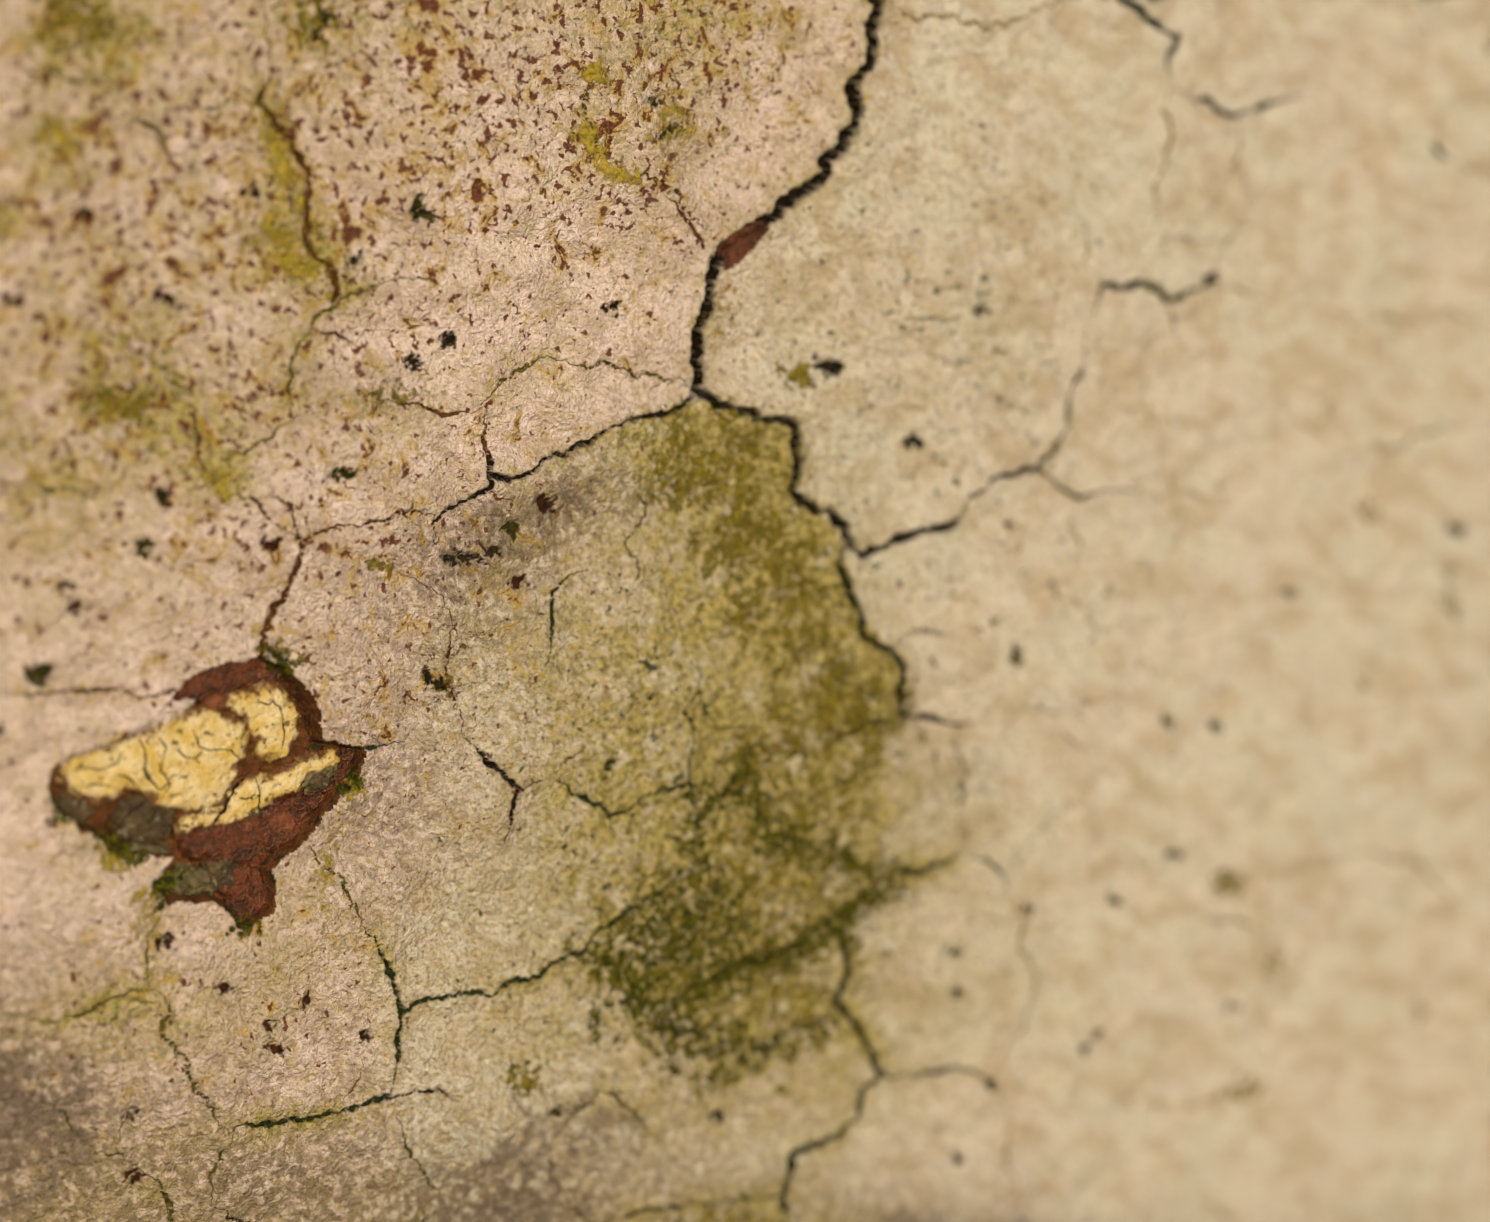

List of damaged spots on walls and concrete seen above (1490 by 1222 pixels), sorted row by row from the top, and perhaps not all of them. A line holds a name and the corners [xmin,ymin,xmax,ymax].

crack [1092,0,1302,349]
crack [0,0,1137,1222]
spalling [45,649,367,937]